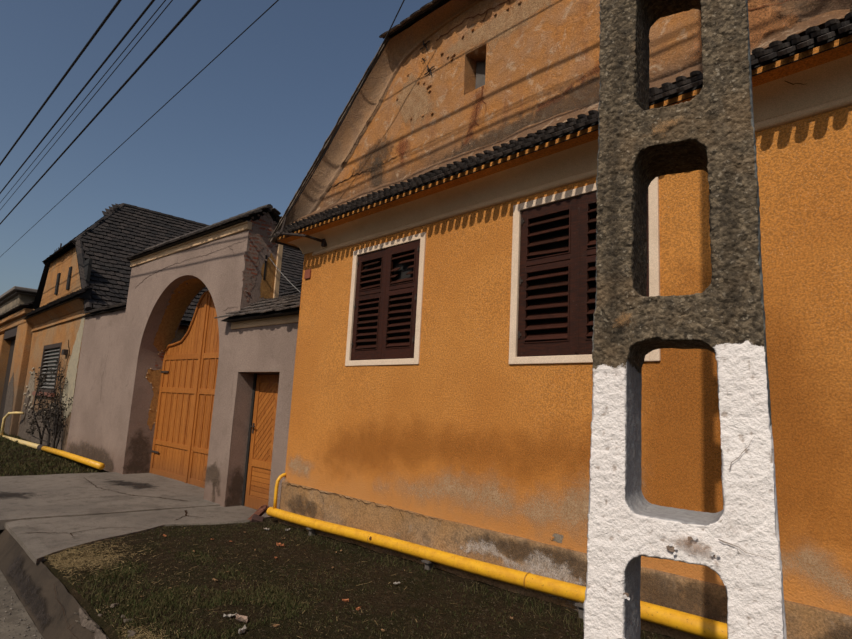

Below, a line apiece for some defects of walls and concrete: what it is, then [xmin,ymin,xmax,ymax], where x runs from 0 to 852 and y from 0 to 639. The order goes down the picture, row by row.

crack [436,0,512,41]
crack [327,87,397,192]
water stain [355,138,392,187]
water stain [445,77,600,158]
spalling [242,212,278,303]
peeling [146,278,206,430]
water stain [523,490,589,525]
water stain [461,537,587,585]
water stain [640,574,727,623]